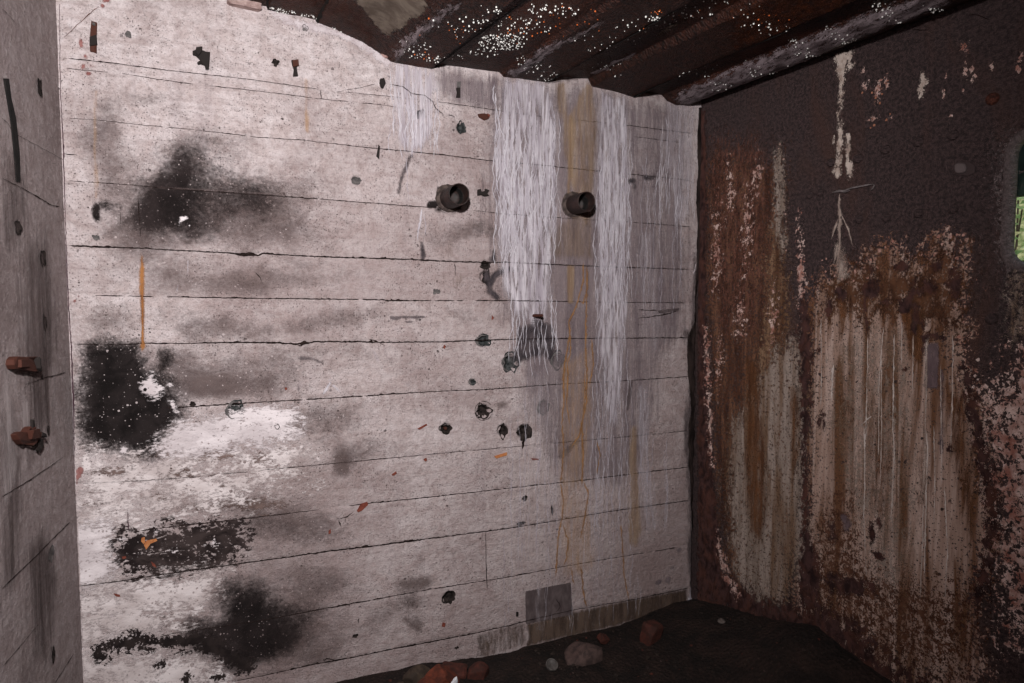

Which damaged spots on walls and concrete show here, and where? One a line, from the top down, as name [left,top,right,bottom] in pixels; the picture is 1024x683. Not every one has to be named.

corrosion [553,217,594,607]
damp [269,0,951,483]
corrosion [695,109,1006,683]
peeling [687,107,1024,683]
damp [863,322,954,595]
peeling [959,40,977,92]